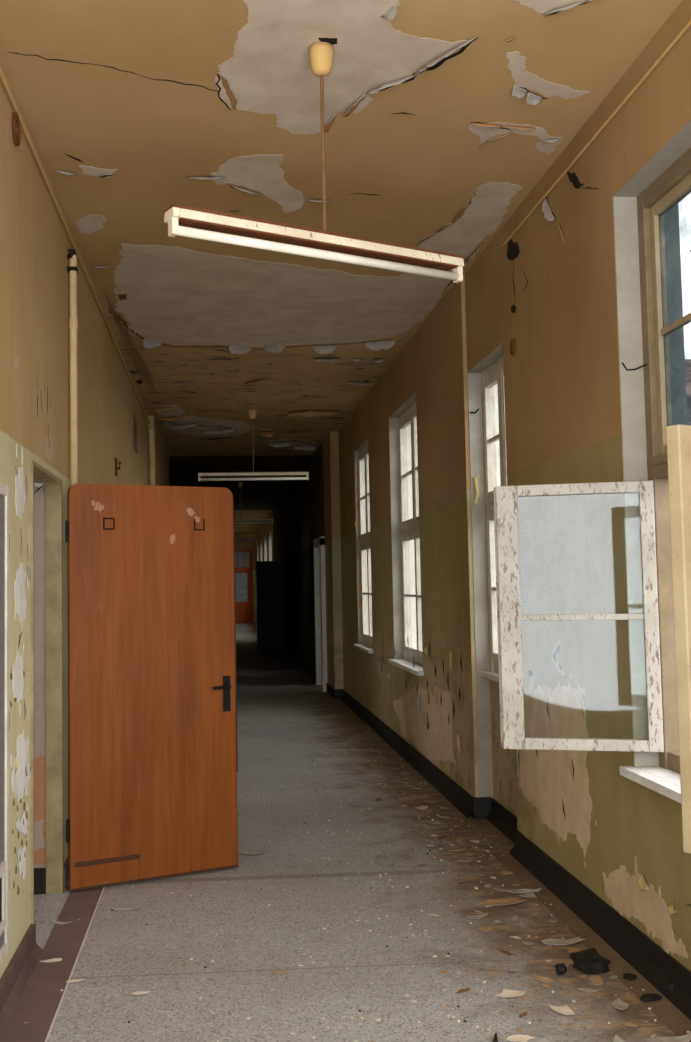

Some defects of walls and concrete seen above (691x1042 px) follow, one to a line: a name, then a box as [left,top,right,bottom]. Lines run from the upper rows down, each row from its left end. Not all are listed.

peeling [514,0,593,16]
crack [9,52,217,91]
peeling [215,0,477,135]
peeling [506,38,590,106]
peeling [468,122,563,156]
peeling [186,154,332,214]
peeling [93,181,523,363]
spalling [507,239,528,313]
spalling [15,445,44,521]
spalling [10,561,46,895]
peeling [517,639,596,868]
spalling [601,856,691,958]